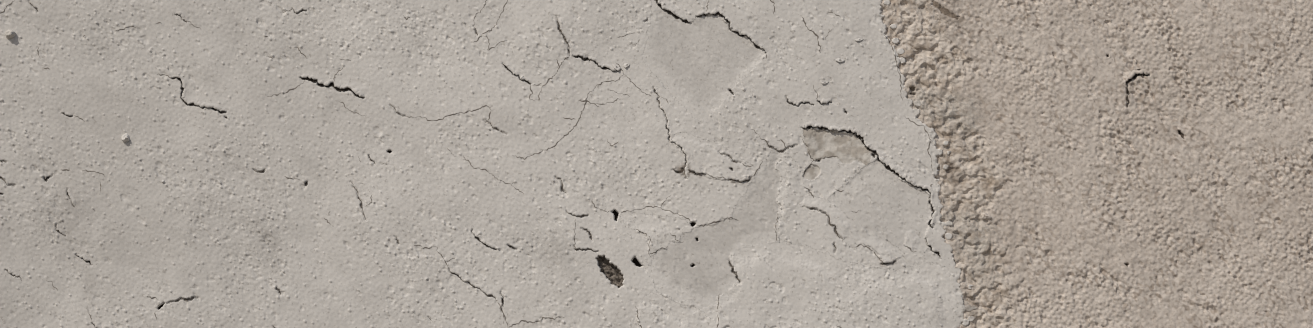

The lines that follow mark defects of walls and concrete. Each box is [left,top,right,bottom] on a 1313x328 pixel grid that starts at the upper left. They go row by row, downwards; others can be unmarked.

crack [159,74,227,118]
crack [265,0,942,265]
peeling [597,0,1017,328]
crack [44,169,105,265]
crack [6,267,58,291]
crack [396,230,564,328]